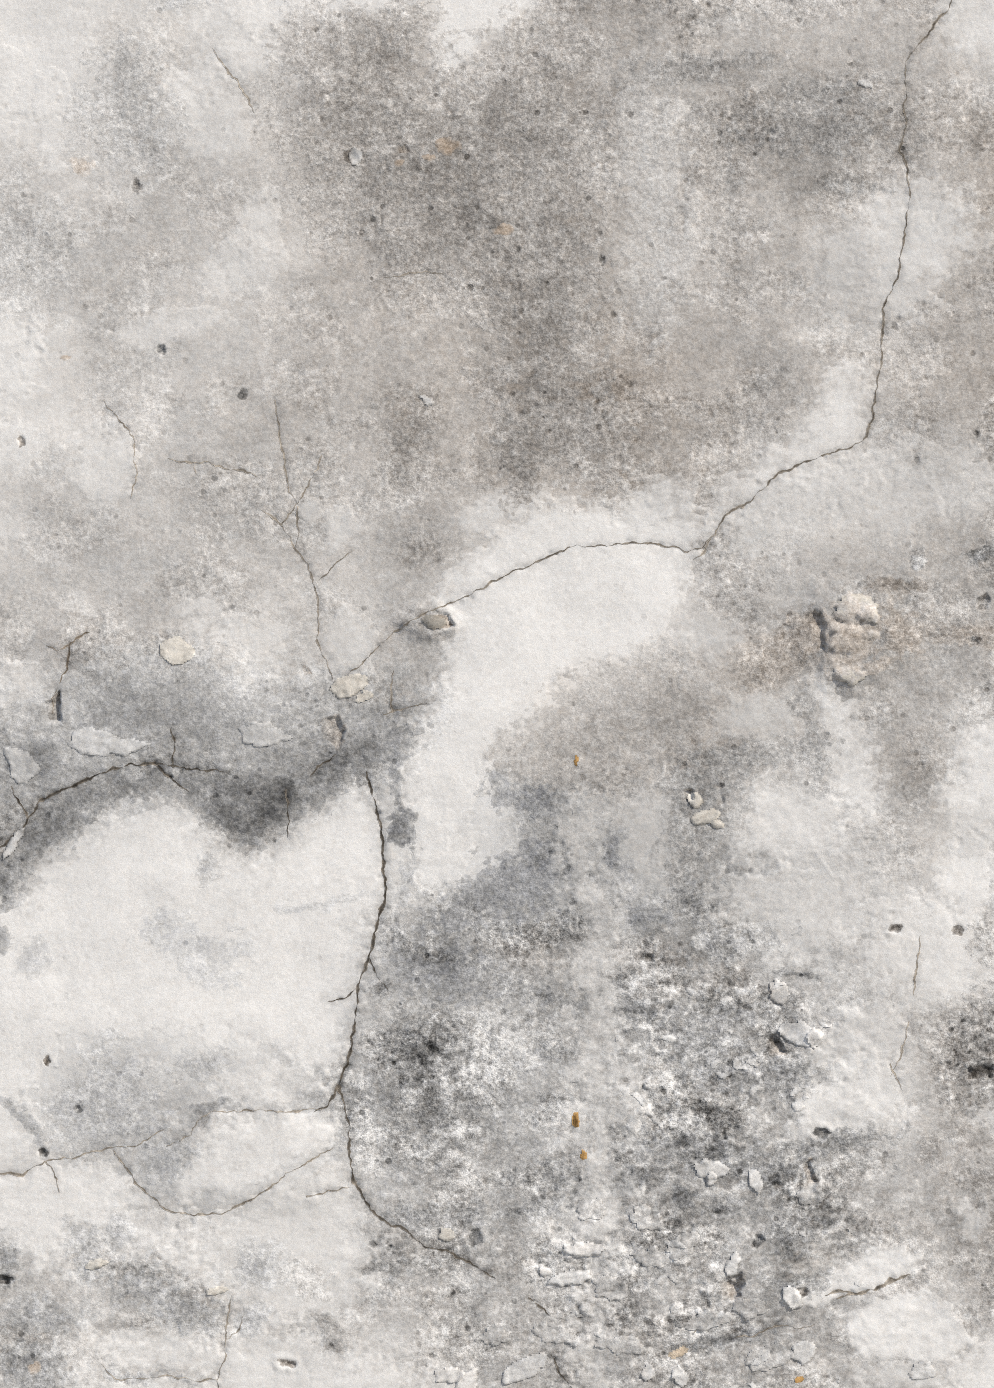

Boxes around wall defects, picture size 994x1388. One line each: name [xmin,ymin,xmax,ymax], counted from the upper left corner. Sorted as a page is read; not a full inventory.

damp [245,0,910,518]
crack [169,0,952,715]
crack [103,400,138,497]
crack [46,632,89,714]
damp [863,545,994,675]
crack [0,729,224,848]
crack [285,754,336,835]
crack [0,771,496,1279]
damp [0,602,994,1388]
crack [890,938,921,1089]
crack [551,1355,568,1382]